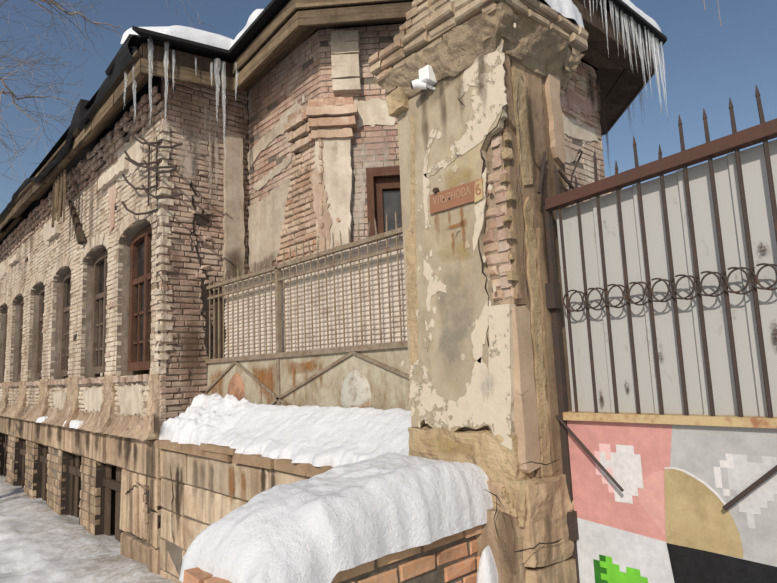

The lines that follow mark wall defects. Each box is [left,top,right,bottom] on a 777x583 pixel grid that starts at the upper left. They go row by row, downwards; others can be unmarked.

crack [189,180,212,373]
spalling [401,38,523,431]
rust [254,369,275,400]
crack [484,489,563,570]